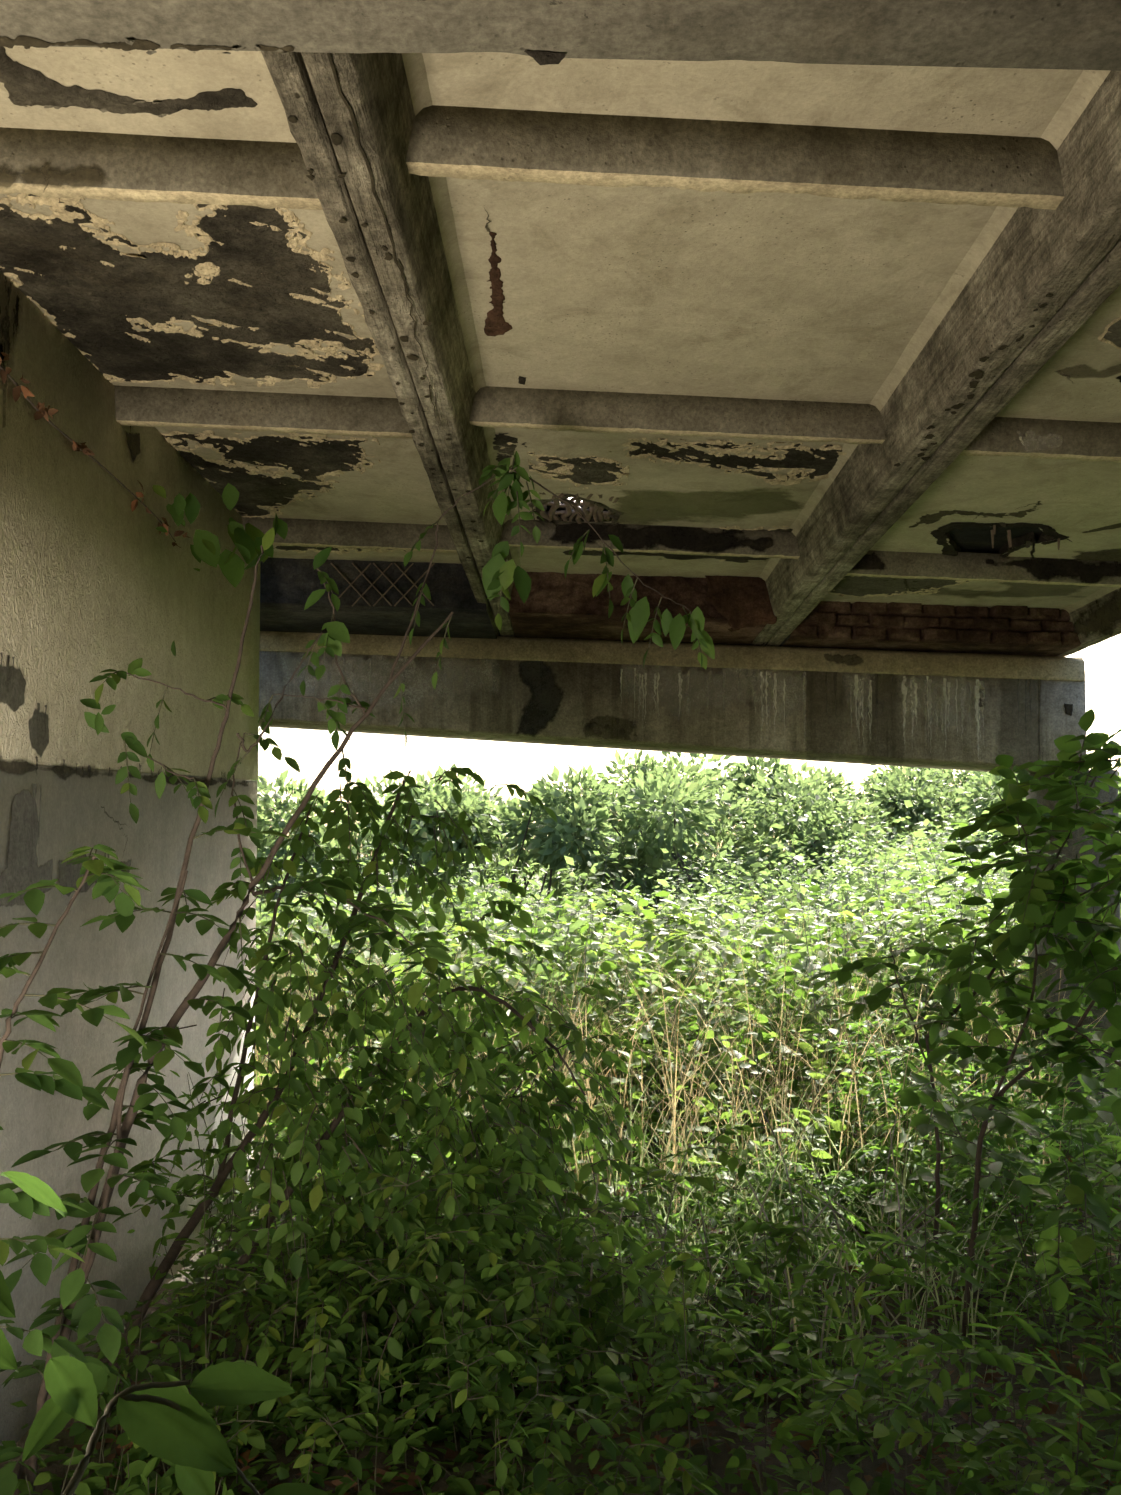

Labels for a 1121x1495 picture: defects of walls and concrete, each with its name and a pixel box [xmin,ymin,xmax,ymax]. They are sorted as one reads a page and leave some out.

spalling [0,36,294,117]
crack [327,53,455,456]
corrosion [484,208,512,336]
peeling [1098,317,1121,350]
peeling [0,193,487,567]
peeling [493,433,849,527]
spalling [930,522,1073,559]
peeling [828,576,972,598]
damp [760,671,786,746]
damp [824,654,872,744]
damp [902,676,981,755]